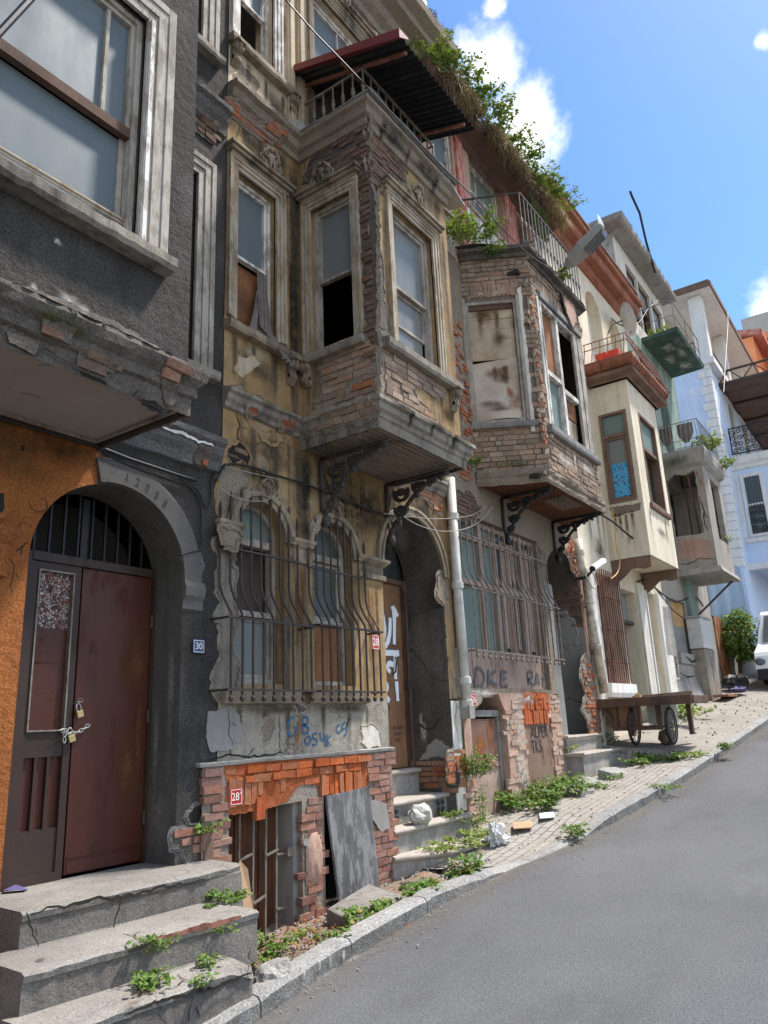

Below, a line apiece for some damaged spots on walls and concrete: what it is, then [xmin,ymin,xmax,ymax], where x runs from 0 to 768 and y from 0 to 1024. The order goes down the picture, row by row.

flaking render [224,96,287,149]
spalling [6,318,124,377]
flaking render [232,352,262,379]
spalling [141,357,270,702]
flaking render [555,610,604,743]
spalling [225,722,382,821]
crack [26,879,207,953]